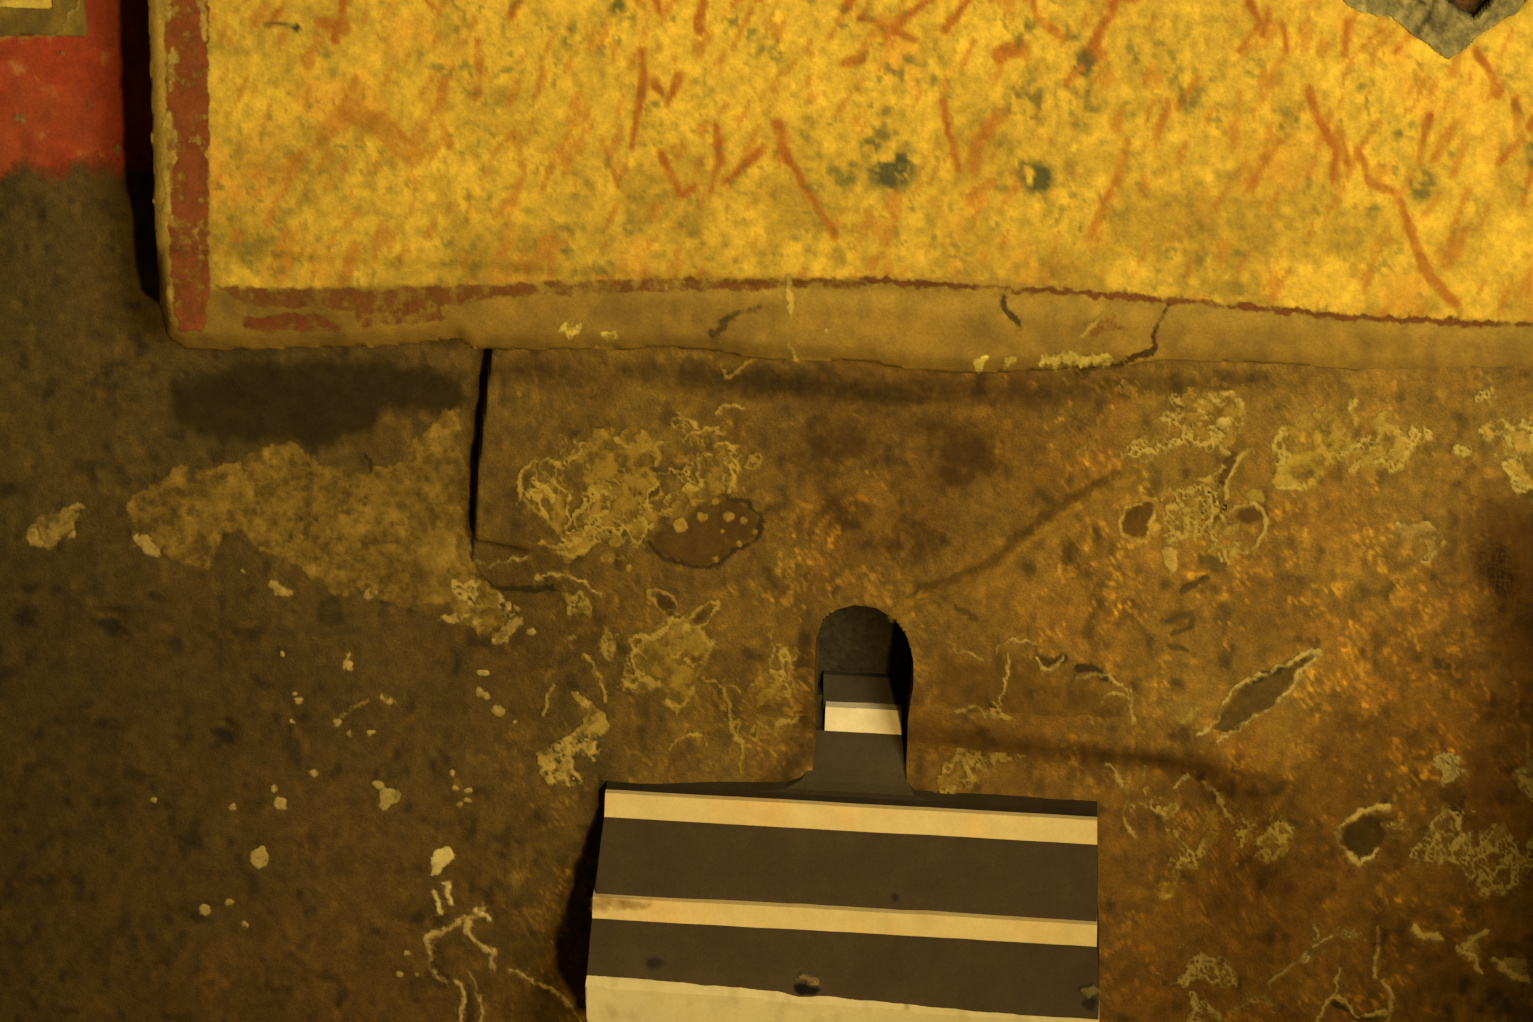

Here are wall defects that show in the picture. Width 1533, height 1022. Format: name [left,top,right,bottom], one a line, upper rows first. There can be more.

spalling [1343,0,1524,59]
peeling [719,359,755,379]
peeling [676,403,745,440]
crack [469,367,602,596]
peeling [516,457,563,499]
peeling [126,409,536,644]
peeling [476,670,517,724]
peeling [450,770,472,806]
spalling [1338,803,1391,867]